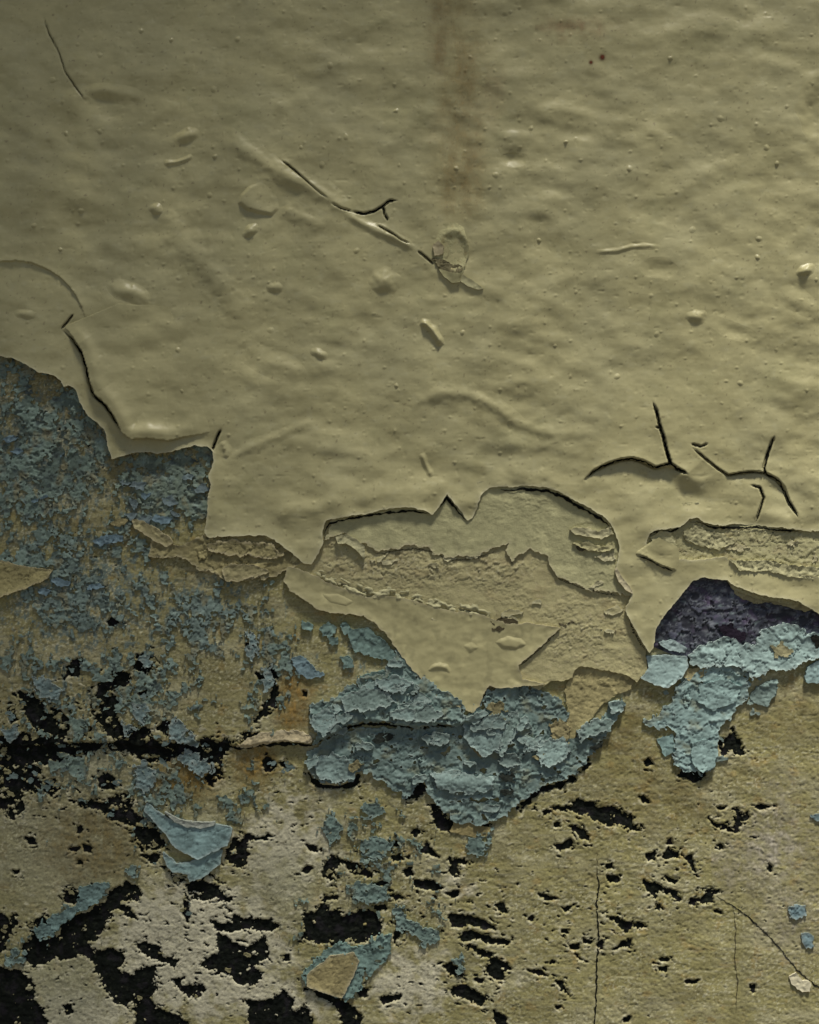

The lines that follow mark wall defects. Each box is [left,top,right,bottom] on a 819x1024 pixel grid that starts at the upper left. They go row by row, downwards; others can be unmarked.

crack [284,162,432,262]
crack [62,315,117,424]
crack [588,403,798,521]
peeling [0,303,819,1024]